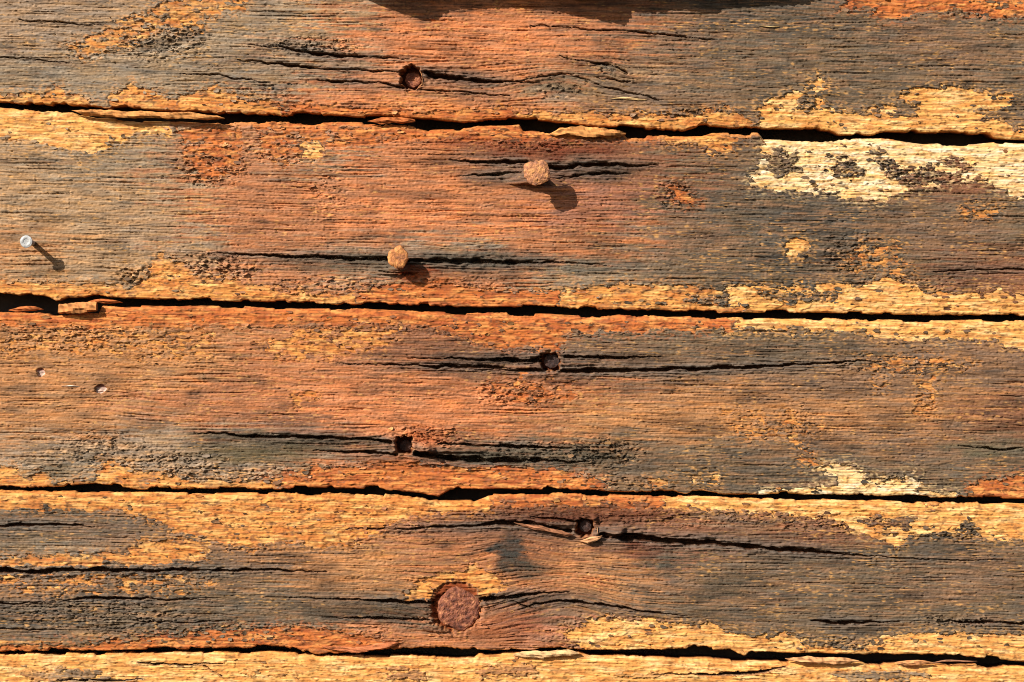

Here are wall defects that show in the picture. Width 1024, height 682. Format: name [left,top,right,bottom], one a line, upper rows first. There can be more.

crack [21,18,101,26]
crack [180,44,659,101]
peeling [0,71,1024,202]
crack [337,355,882,374]
crack [199,432,590,464]
peeling [0,409,1024,611]